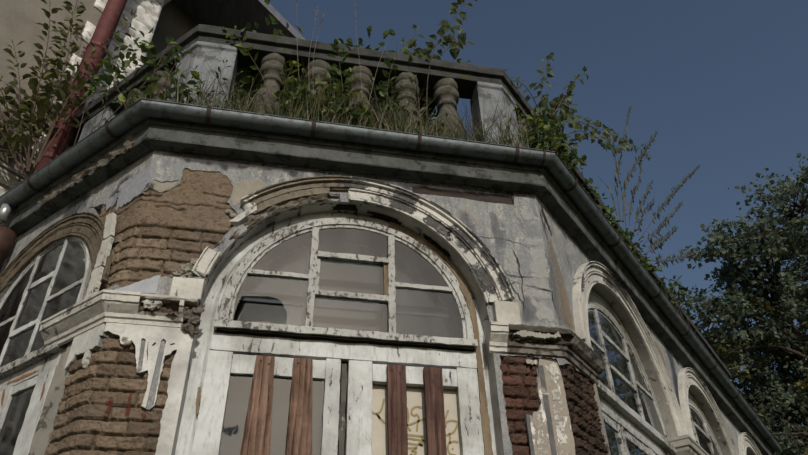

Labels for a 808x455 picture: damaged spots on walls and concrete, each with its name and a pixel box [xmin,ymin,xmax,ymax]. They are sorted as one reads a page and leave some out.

crack [541,206,552,237]
spalling [84,168,550,455]
crack [480,236,556,312]
spalling [44,333,177,455]
spalling [500,356,608,455]